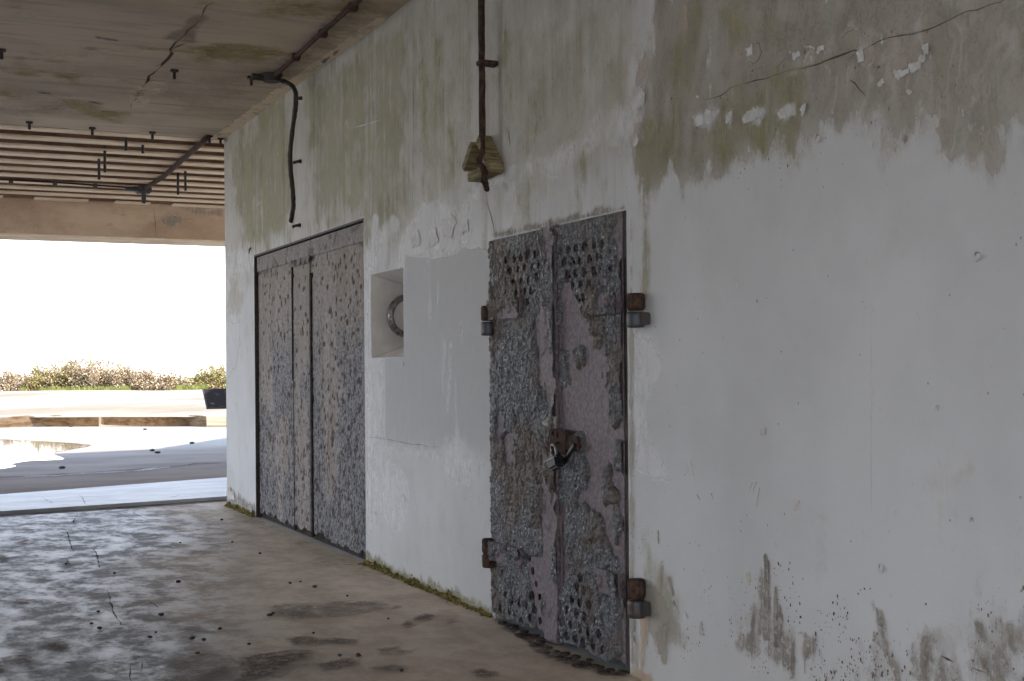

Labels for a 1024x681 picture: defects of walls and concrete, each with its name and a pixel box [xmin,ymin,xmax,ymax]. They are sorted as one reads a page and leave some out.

crack [130,2,213,107]
peeling [694,103,806,127]
water stain [612,0,1024,195]
crack [706,0,1003,102]
peeling [877,43,929,95]
water stain [645,562,704,664]
water stain [729,554,958,681]
water stain [971,601,1024,681]